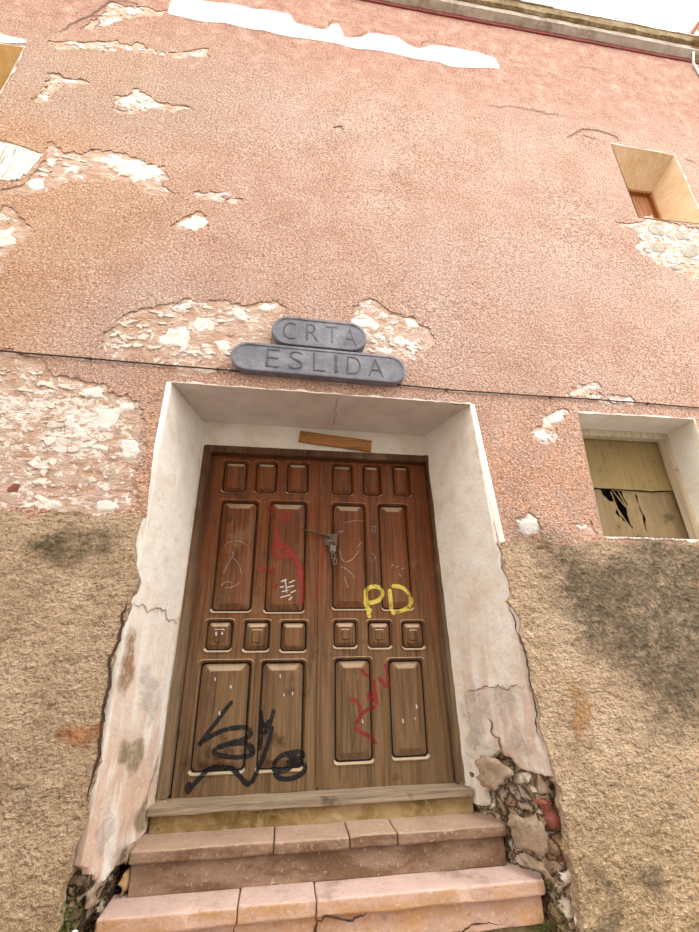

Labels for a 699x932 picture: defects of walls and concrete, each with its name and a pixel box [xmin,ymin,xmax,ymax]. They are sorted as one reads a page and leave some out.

crack [54,0,139,32]
peeling [84,0,499,69]
peeling [0,141,175,196]
peeling [101,298,287,376]
peeling [350,298,435,361]
peeling [0,349,148,516]
water stain [31,531,110,564]
water stain [546,536,699,718]
crack [87,601,176,799]
spalling [469,753,577,932]
crack [313,912,367,932]
crack [454,922,503,932]